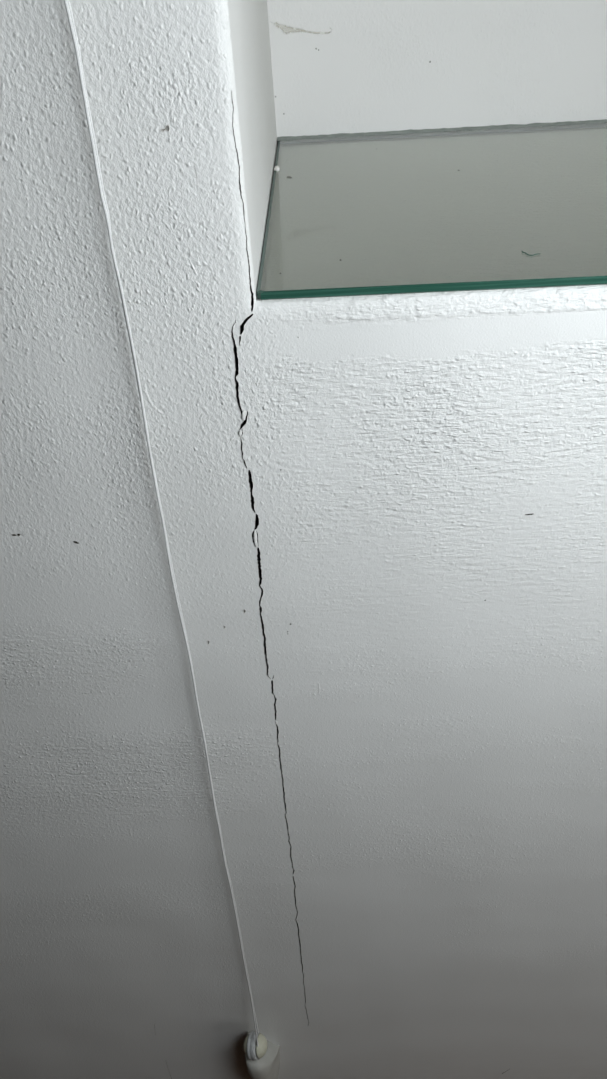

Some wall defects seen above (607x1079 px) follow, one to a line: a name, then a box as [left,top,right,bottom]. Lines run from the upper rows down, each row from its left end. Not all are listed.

crack [231,90,309,1025]